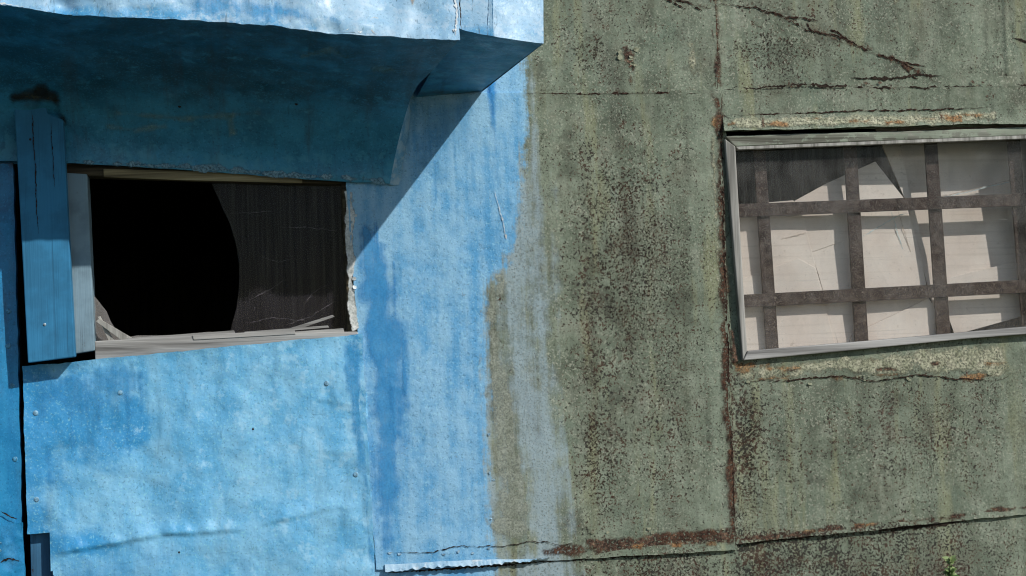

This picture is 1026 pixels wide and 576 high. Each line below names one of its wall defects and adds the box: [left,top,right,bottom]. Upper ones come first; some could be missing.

rust [734,32,843,65]
crack [667,0,935,82]
rust [543,95,1026,562]